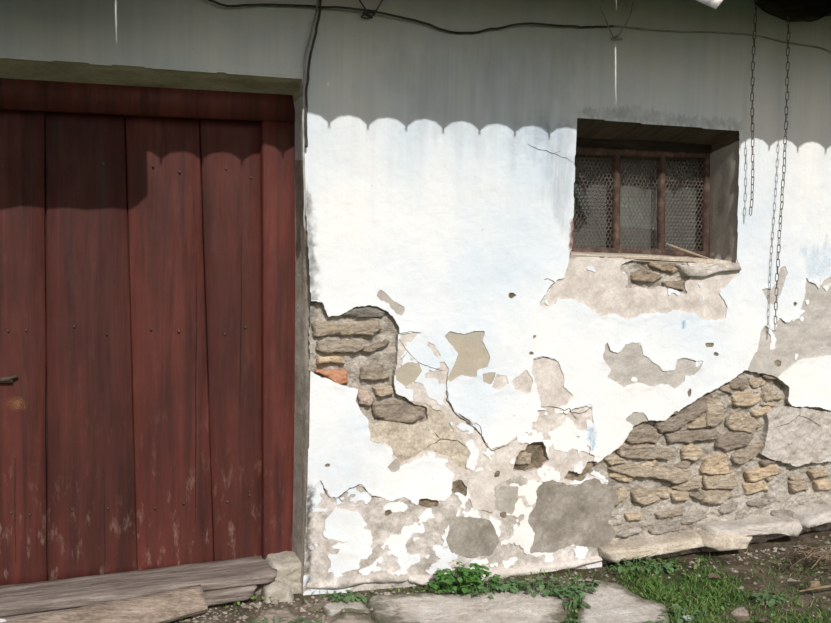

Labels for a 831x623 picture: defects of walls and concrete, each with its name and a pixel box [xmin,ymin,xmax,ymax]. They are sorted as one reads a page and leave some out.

spalling [303,277,831,595]
peeling [540,251,739,320]